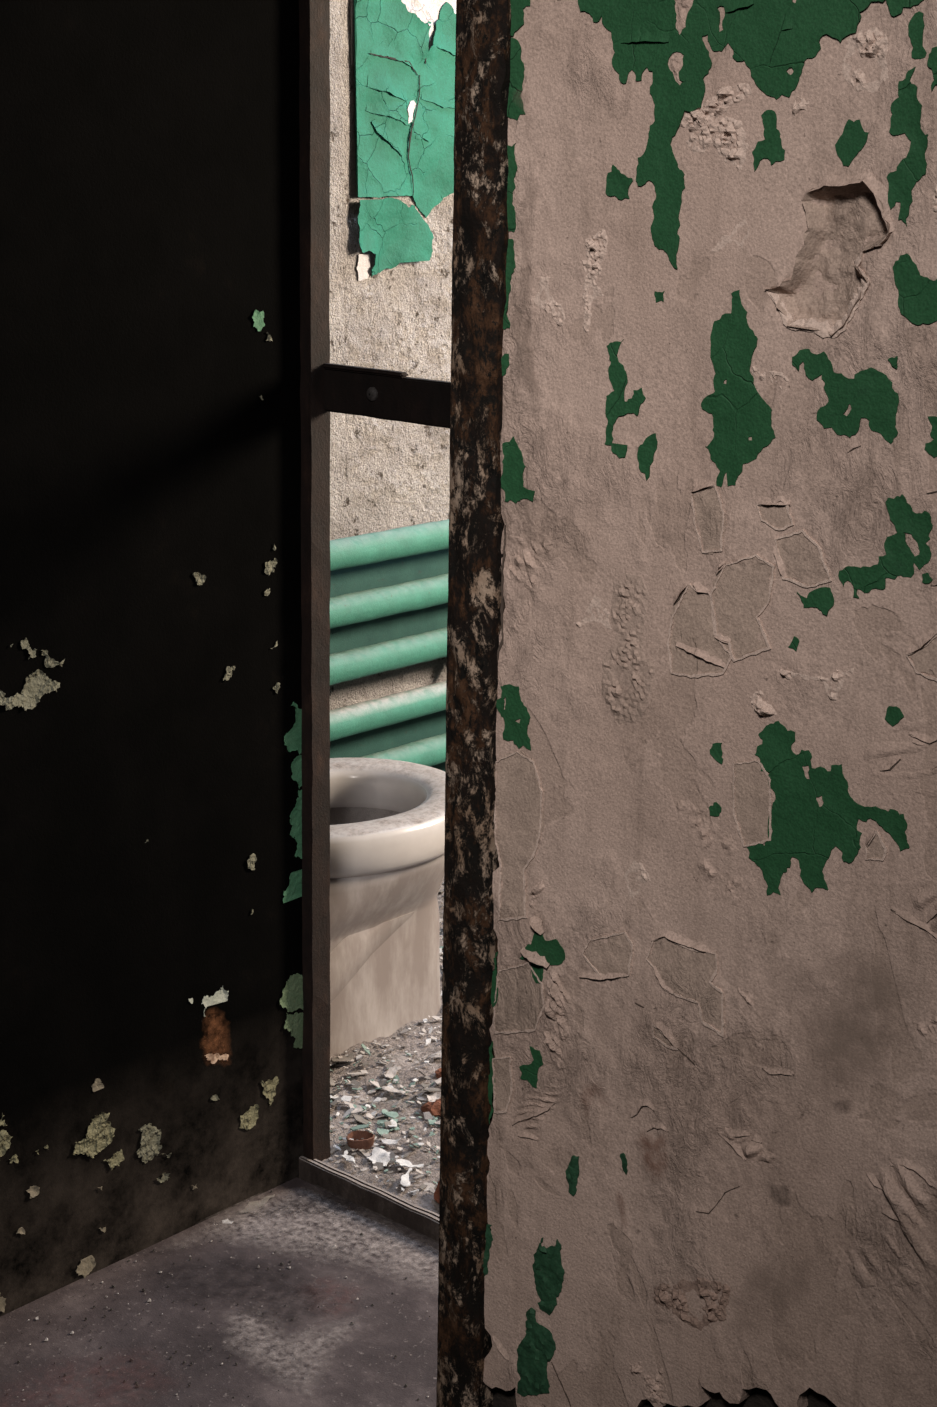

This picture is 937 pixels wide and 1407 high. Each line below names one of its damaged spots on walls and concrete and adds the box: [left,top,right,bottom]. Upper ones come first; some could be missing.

peeling [345,0,456,382]
peeling [574,0,937,681]
flaking render [346,414,450,505]
crack [762,495,791,507]
peeling [0,638,65,711]
peeling [709,690,910,895]
crack [890,905,937,939]
peeling [73,1112,171,1183]
crack [629,1098,669,1132]
crack [696,1129,762,1214]
crack [867,1158,937,1221]
crack [492,1336,510,1361]